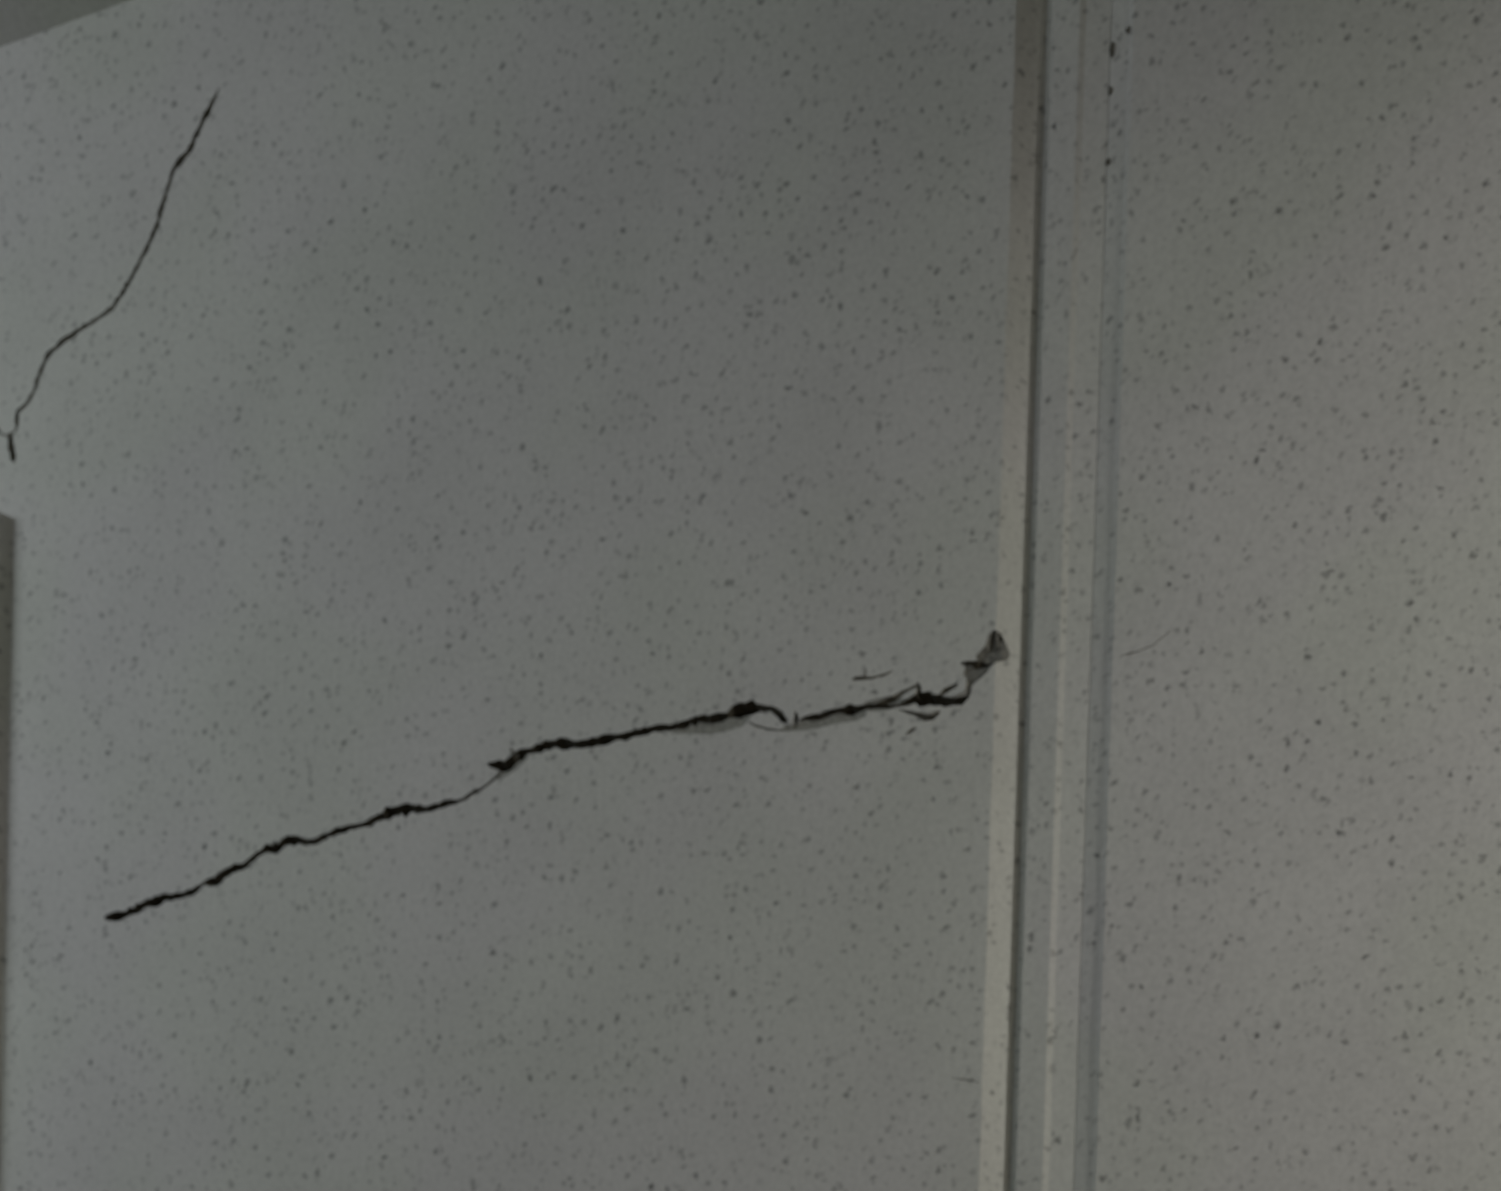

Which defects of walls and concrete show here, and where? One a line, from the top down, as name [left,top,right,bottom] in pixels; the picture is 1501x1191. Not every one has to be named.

crack [0,88,220,463]
crack [105,669,971,921]